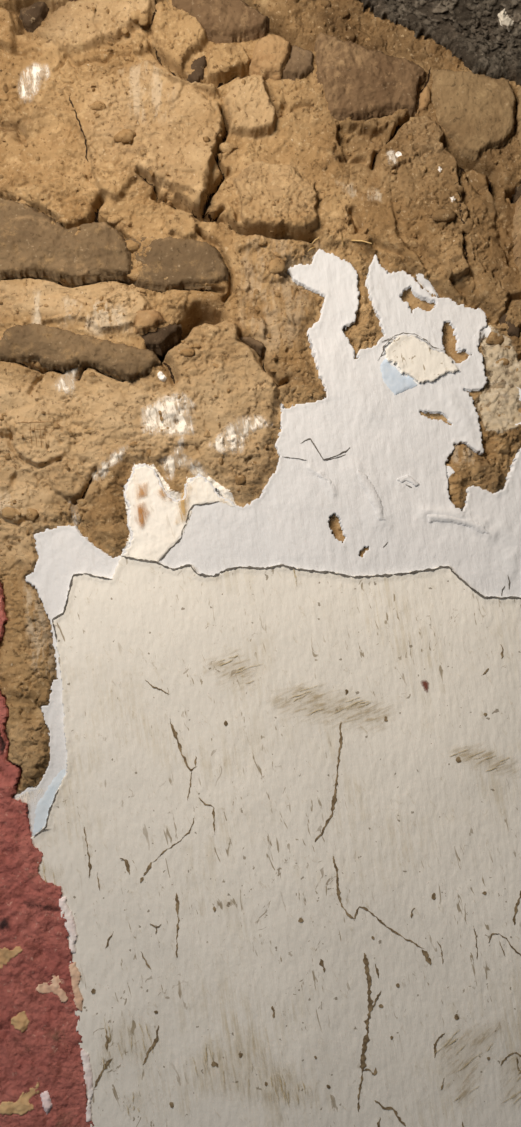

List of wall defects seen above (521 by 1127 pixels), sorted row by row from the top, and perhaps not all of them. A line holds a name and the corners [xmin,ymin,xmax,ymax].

crack [140,118,237,233]
spalling [0,0,521,837]
crack [120,722,215,875]
crack [315,723,443,965]
spalling [0,946,22,968]
peeling [36,897,83,1011]
crack [140,893,179,972]
crack [474,891,521,958]
spalling [11,1011,30,1033]
spalling [0,1082,52,1115]
crack [94,1031,112,1088]
crack [357,953,406,1127]